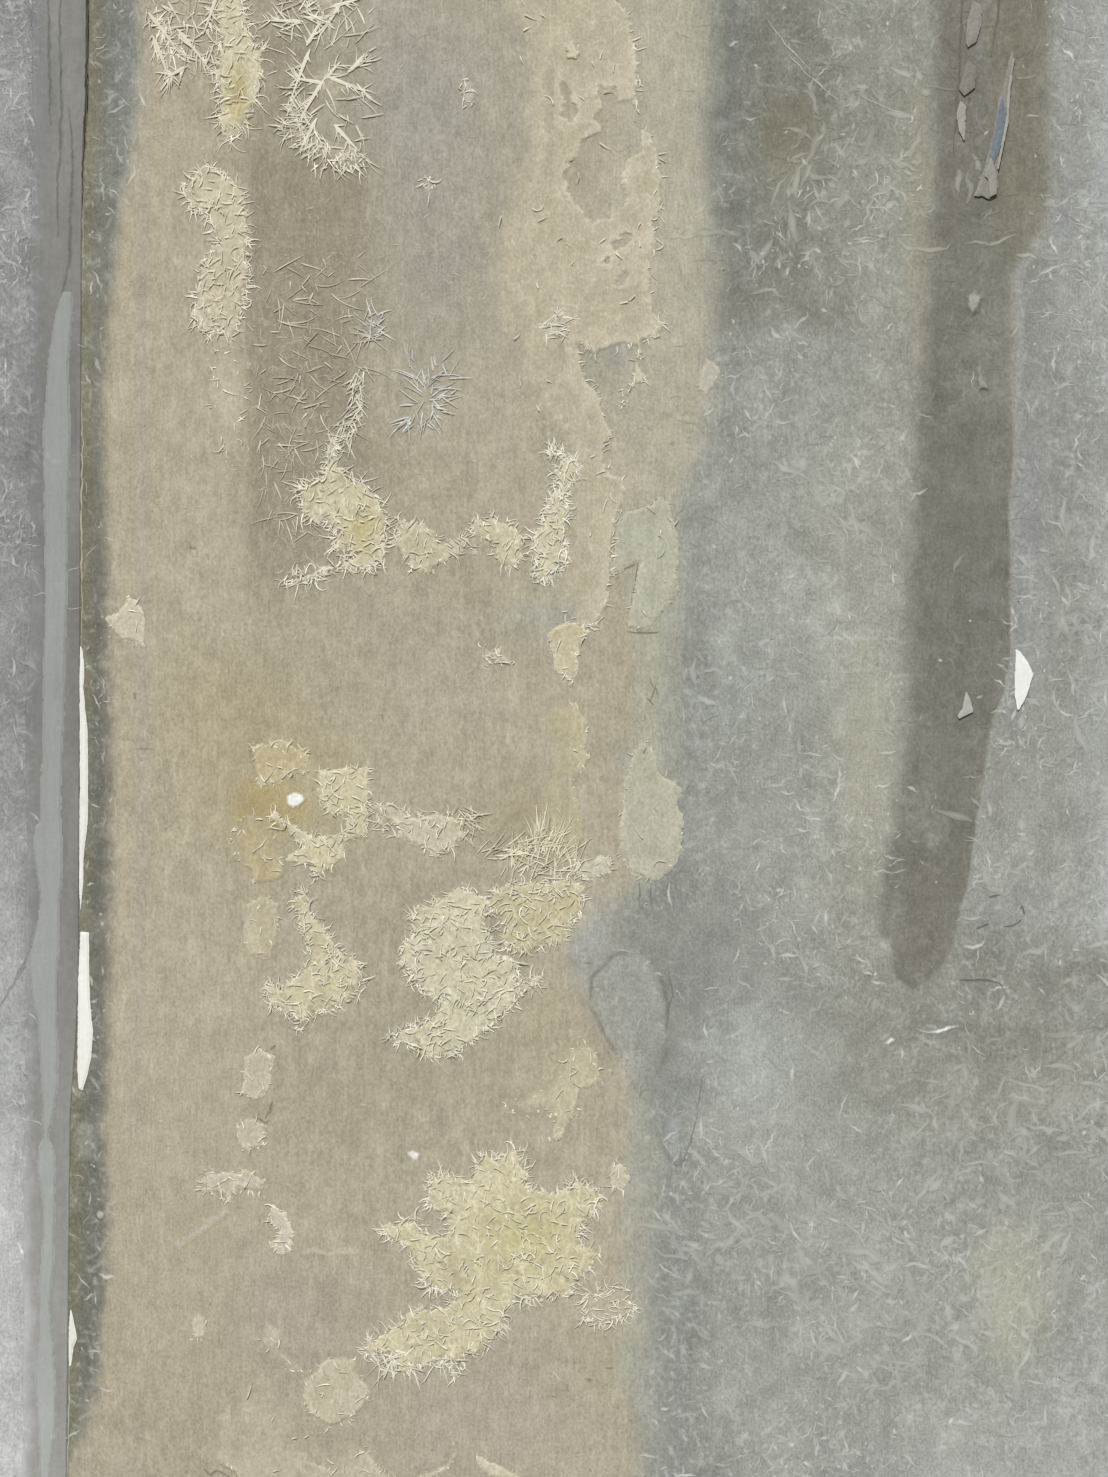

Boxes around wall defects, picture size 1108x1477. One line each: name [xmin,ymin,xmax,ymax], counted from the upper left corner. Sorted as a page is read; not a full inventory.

peeling [17,0,740,1477]
water stain [829,0,1059,993]